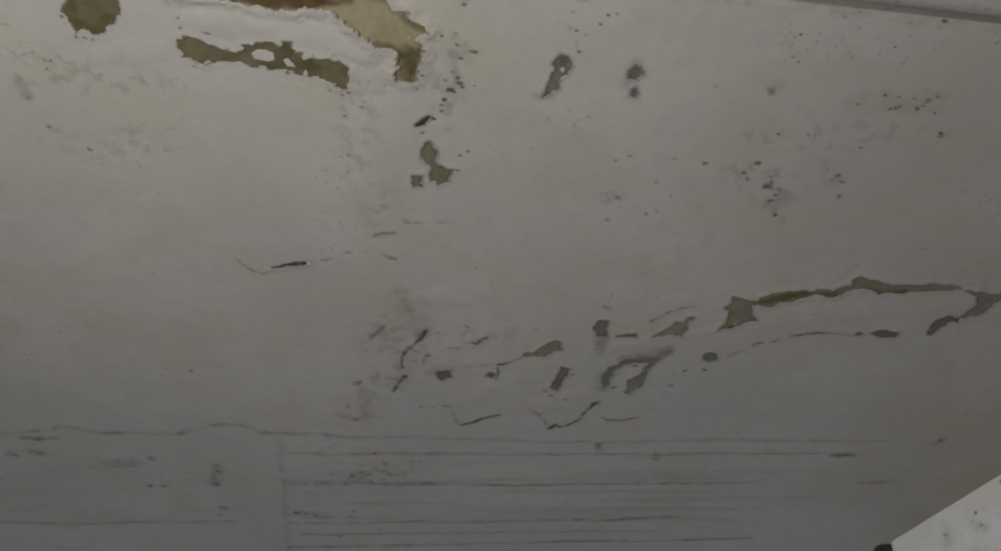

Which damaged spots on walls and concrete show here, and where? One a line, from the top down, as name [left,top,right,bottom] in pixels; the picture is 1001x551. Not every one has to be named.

peeling [52,0,132,43]
peeling [166,0,446,96]
peeling [536,48,580,102]
peeling [622,62,648,101]
peeling [405,113,469,194]
crack [264,262,315,273]
peeling [711,271,1001,341]
peeling [432,367,456,383]
peeling [518,337,576,395]
peeling [588,312,700,397]
spalling [698,349,721,370]